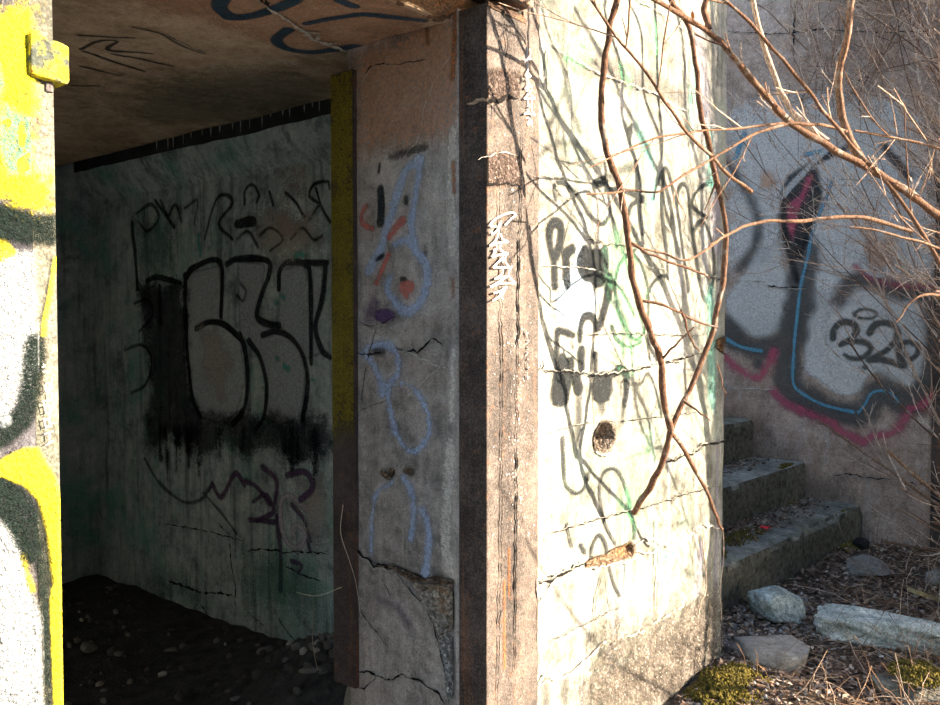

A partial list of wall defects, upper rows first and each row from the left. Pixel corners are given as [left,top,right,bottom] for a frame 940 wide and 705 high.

crack [356,317,452,410]
crack [478,134,725,700]
crack [357,549,445,705]
spalling [375,565,454,702]